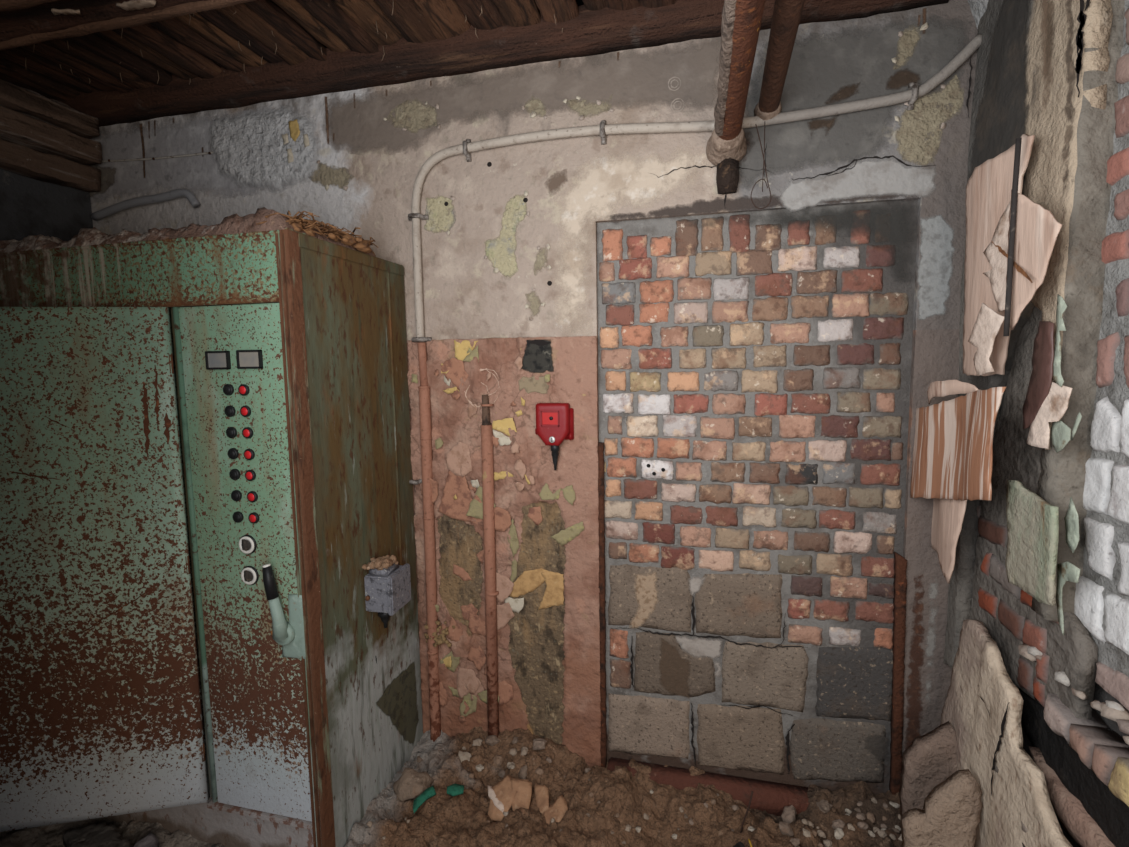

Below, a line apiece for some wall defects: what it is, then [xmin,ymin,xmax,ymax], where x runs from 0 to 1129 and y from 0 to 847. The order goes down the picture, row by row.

flaking render [384,100,441,133]
flaking render [563,96,614,120]
crack [651,144,934,180]
flaking render [424,196,456,235]
flaking render [525,244,552,321]
flaking render [907,134,1082,847]
peeling [407,336,601,767]
crack [611,592,808,687]
crack [689,703,697,766]
crack [726,705,795,774]